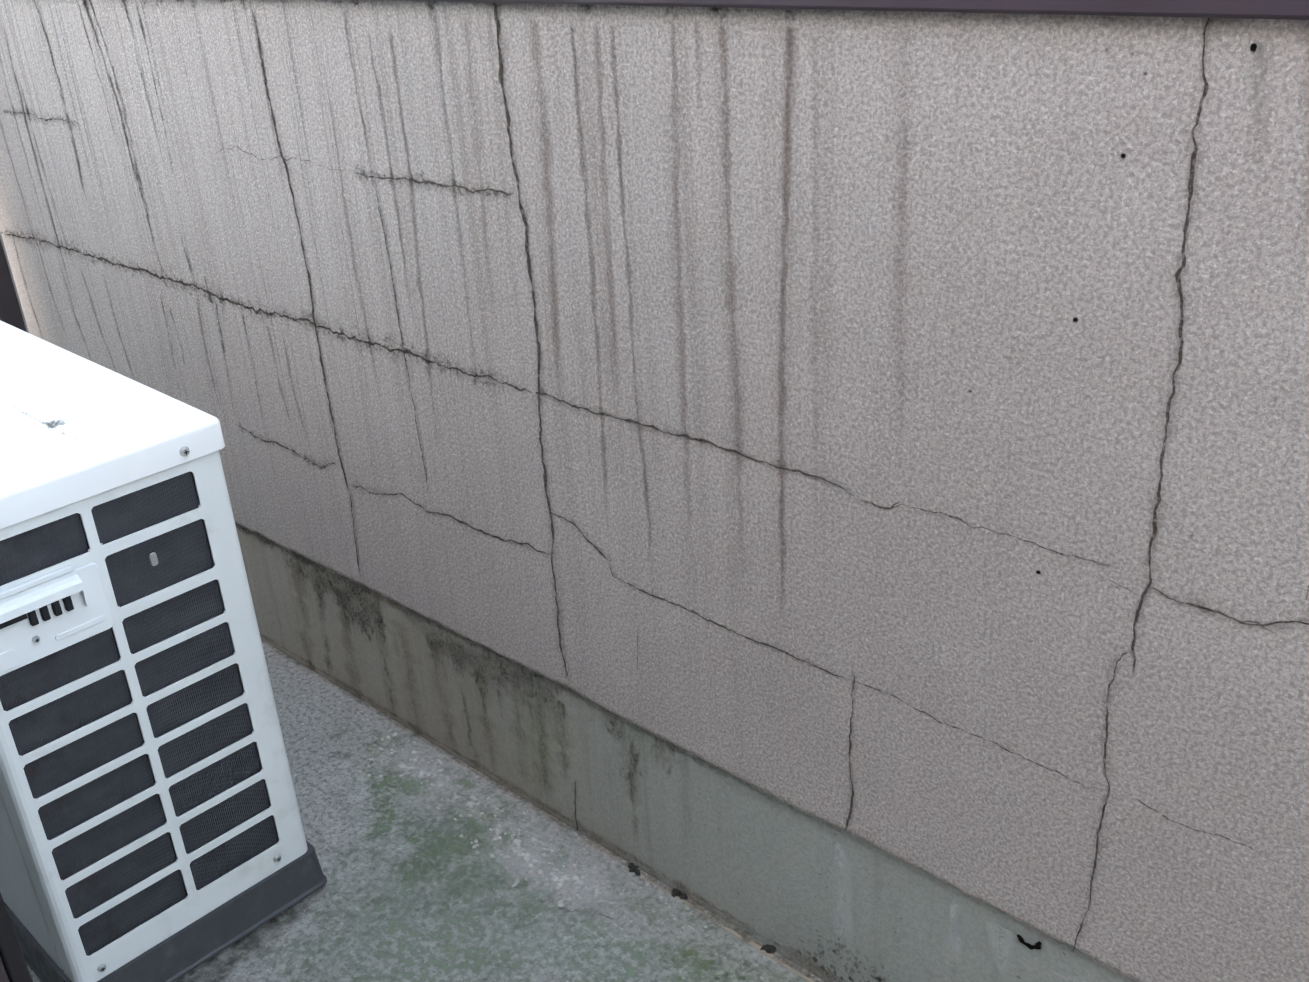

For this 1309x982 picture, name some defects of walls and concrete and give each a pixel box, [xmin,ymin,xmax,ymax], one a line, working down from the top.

water stain [79,0,153,239]
water stain [236,525,415,643]
crack [2,5,1105,831]
crack [1074,22,1309,947]